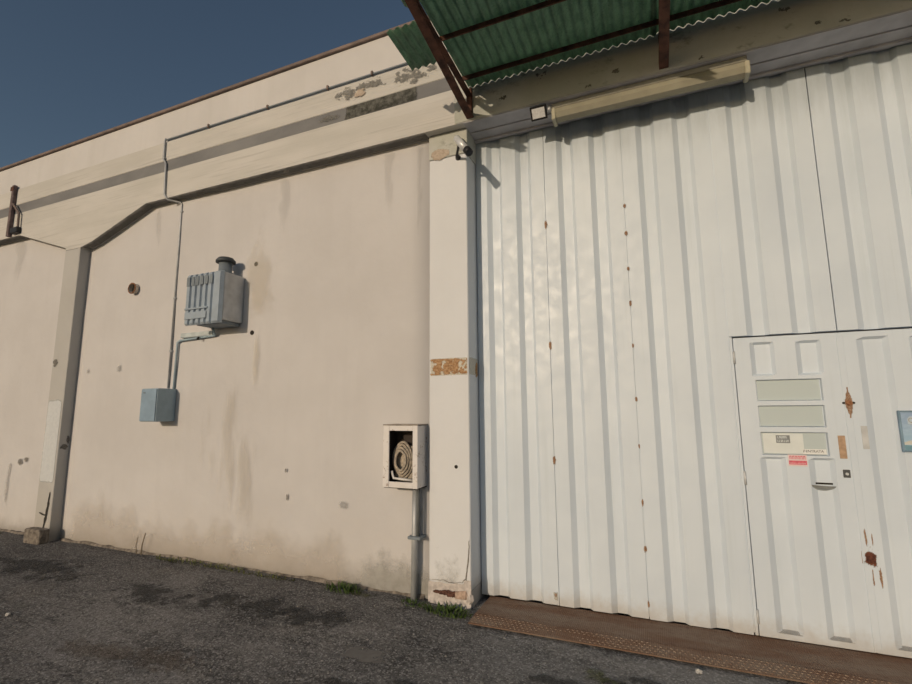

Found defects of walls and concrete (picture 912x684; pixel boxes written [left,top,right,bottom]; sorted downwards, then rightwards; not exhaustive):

corrosion [861,529,883,588]